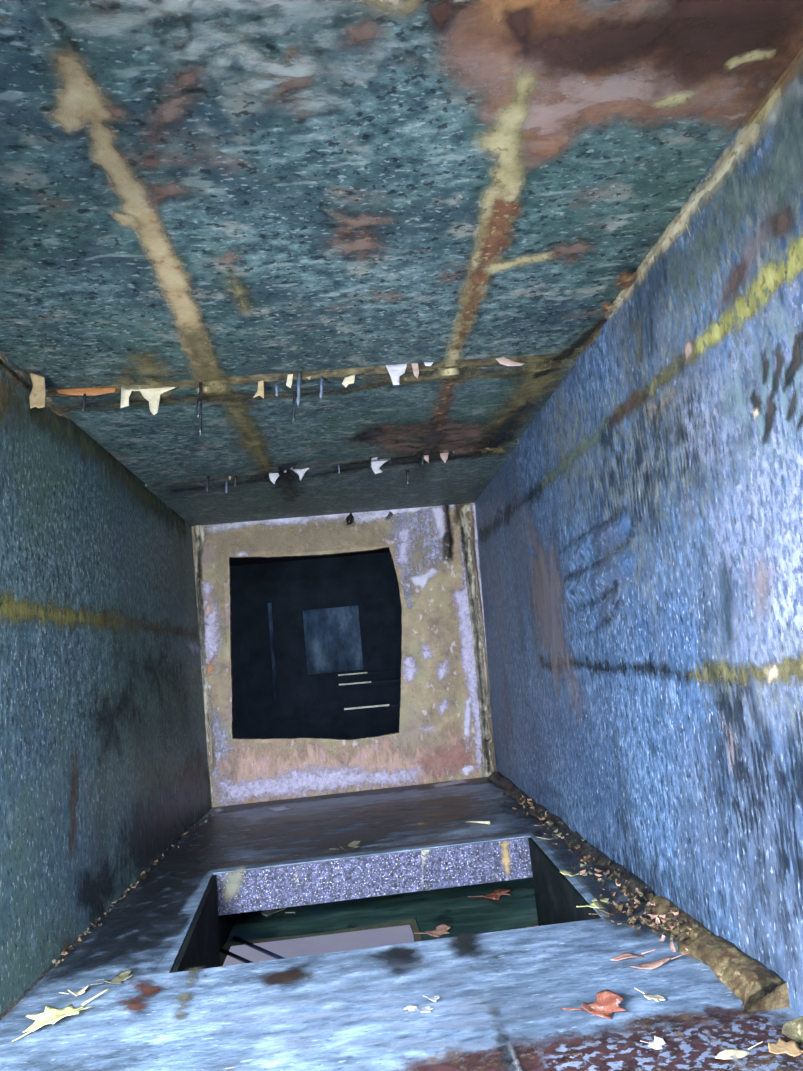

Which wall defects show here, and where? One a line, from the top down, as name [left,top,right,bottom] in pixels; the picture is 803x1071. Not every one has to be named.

rust [242,46,328,118]
rust [427,0,803,162]
rust [137,69,199,168]
rust [333,216,393,259]
peeling [120,385,176,415]
peeling [342,375,355,388]
peeling [386,362,433,385]
peeling [496,357,525,366]
peeling [269,467,309,484]
peeling [369,457,388,474]
peeling [185,581,222,675]
peeling [203,505,483,776]